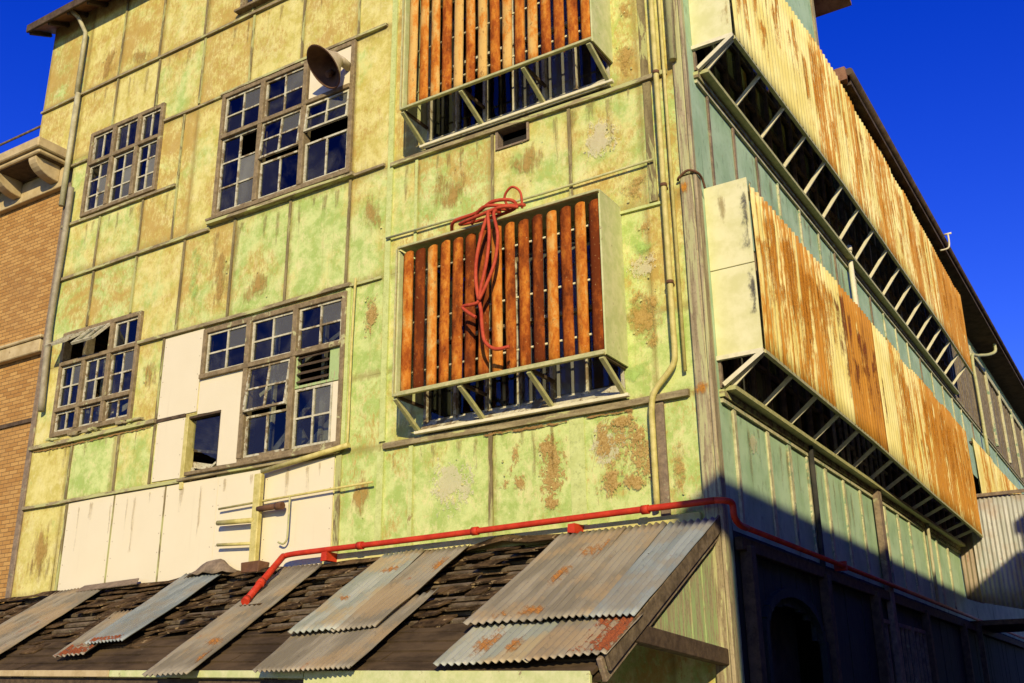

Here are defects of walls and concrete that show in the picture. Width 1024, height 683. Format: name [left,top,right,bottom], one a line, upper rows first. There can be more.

peeling [583,121,620,158]
rust [737,0,882,183]
peeling [626,252,662,348]
rust [756,219,888,415]
rust [883,195,964,340]
peeling [537,432,568,510]
peeling [589,407,659,501]
rust [896,364,971,494]
rust [54,635,122,656]
rust [565,613,640,654]